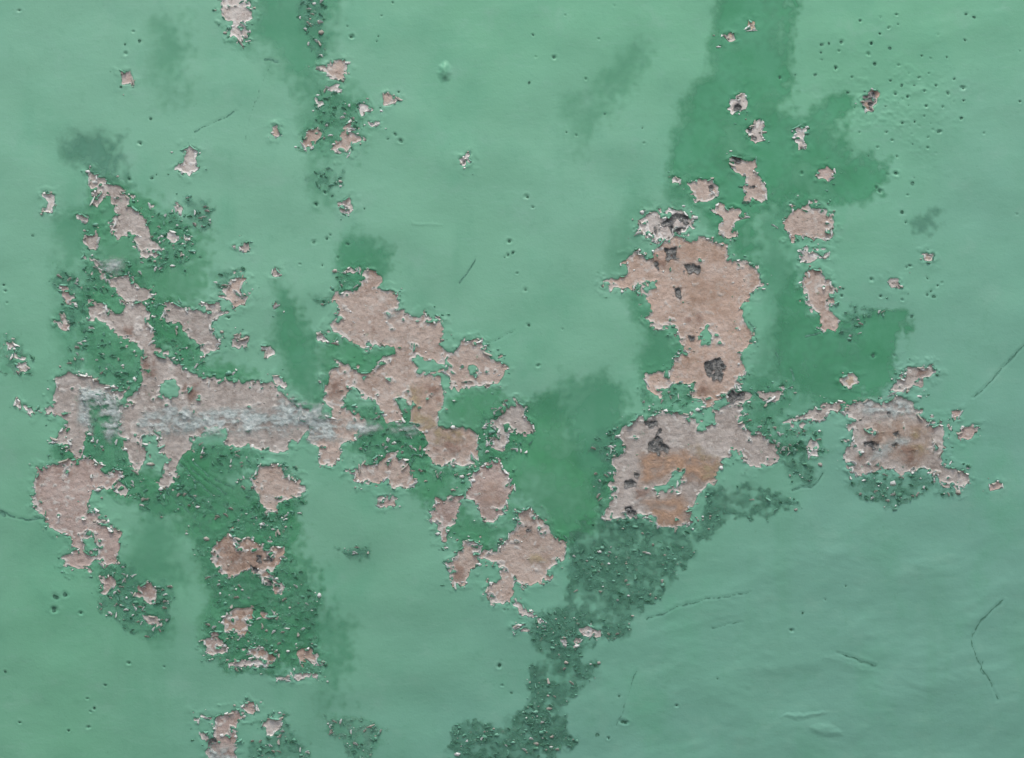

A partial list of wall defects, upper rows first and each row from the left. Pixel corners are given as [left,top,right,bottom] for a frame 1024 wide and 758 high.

peeling [212,0,256,49]
peeling [294,0,403,158]
leakage [670,0,889,255]
leakage [643,333,680,374]
leakage [765,259,913,406]
peeling [14,145,979,758]
crack [971,600,1003,699]